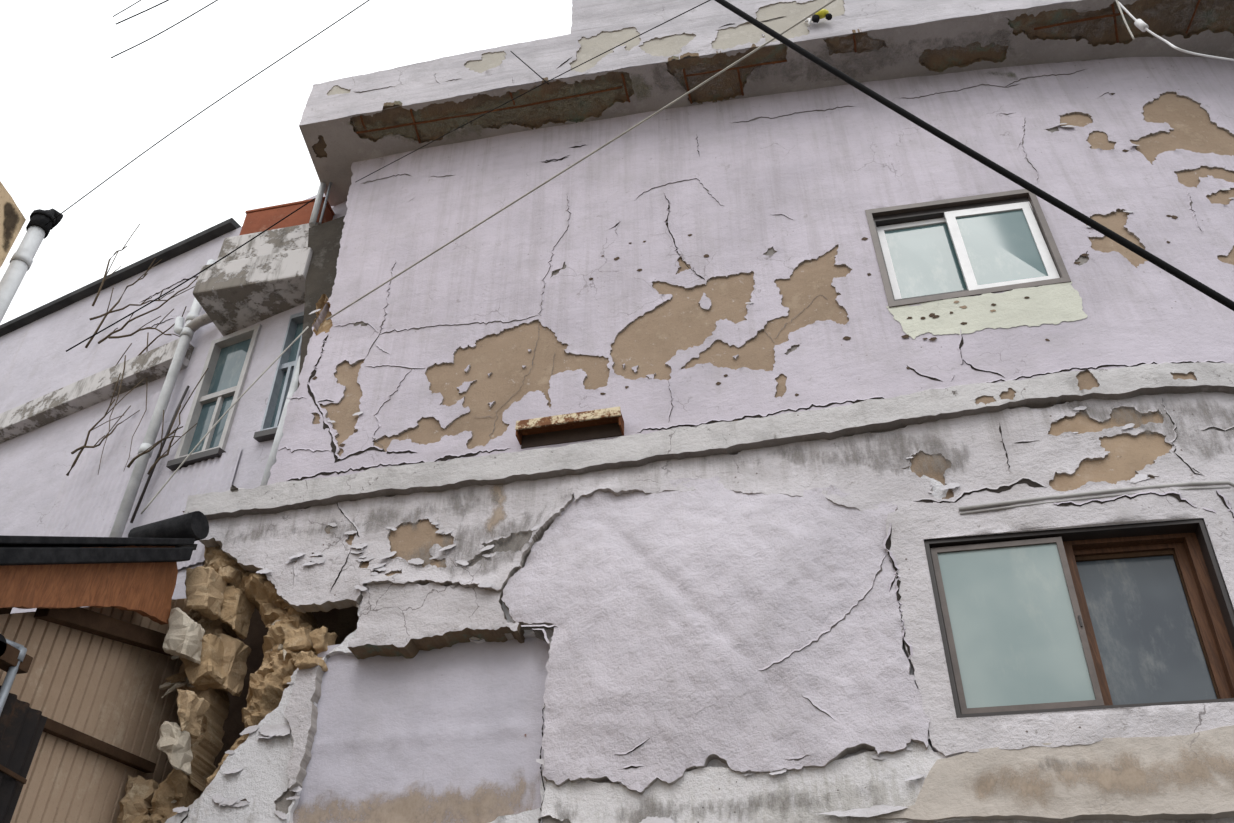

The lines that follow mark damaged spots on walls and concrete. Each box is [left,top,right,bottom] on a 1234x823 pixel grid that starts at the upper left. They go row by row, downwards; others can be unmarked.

spalling [350,0,845,143]
spalling [919,0,1234,73]
peeling [1044,91,1234,205]
water stain [3,203,19,251]
crack [277,193,572,593]
peeling [372,244,852,452]
crack [637,380,889,433]
crack [914,398,1234,522]
peeling [1048,406,1173,491]
crack [758,523,913,671]
water stain [623,798,672,823]
water stain [977,755,1234,798]